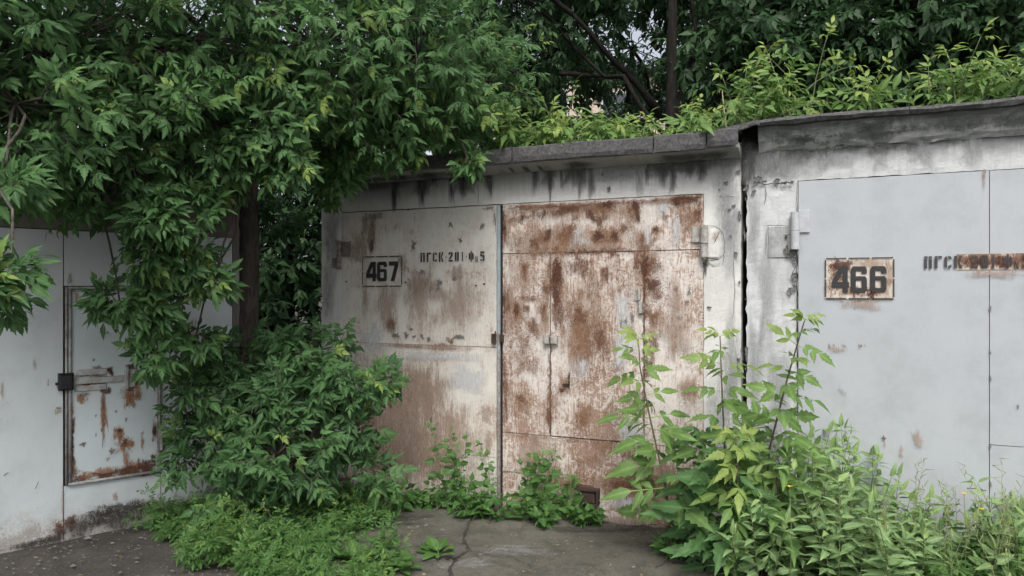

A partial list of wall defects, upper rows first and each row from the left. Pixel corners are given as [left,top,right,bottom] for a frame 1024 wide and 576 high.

water stain [417,174,468,204]
water stain [509,167,594,196]
rust [960,256,1024,277]
rust [363,258,475,349]
rust [482,196,703,466]
rust [56,363,164,482]
rust [362,370,490,472]
rust [557,446,676,501]
crack [416,515,533,576]